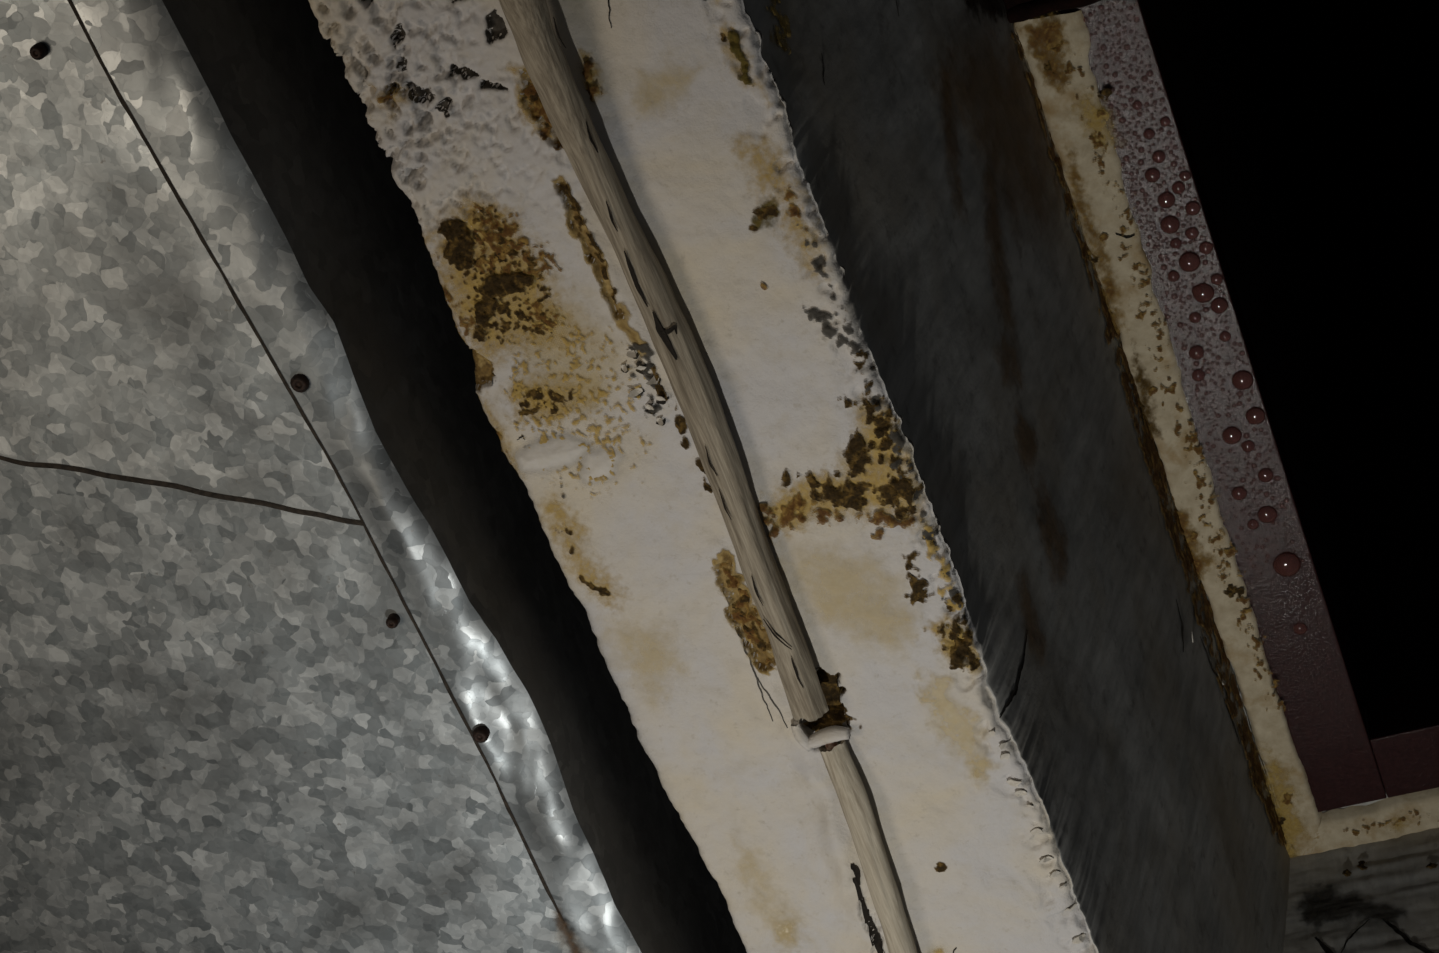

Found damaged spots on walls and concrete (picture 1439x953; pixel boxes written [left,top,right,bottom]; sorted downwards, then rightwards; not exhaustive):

spalling [390,23,453,118]
spalling [449,64,508,90]
spalling [485,9,508,44]
leakage [749,199,780,231]
leakage [426,201,652,496]
rust [1011,15,1304,858]
leakage [759,225,987,777]
crack [1314,919,1433,953]